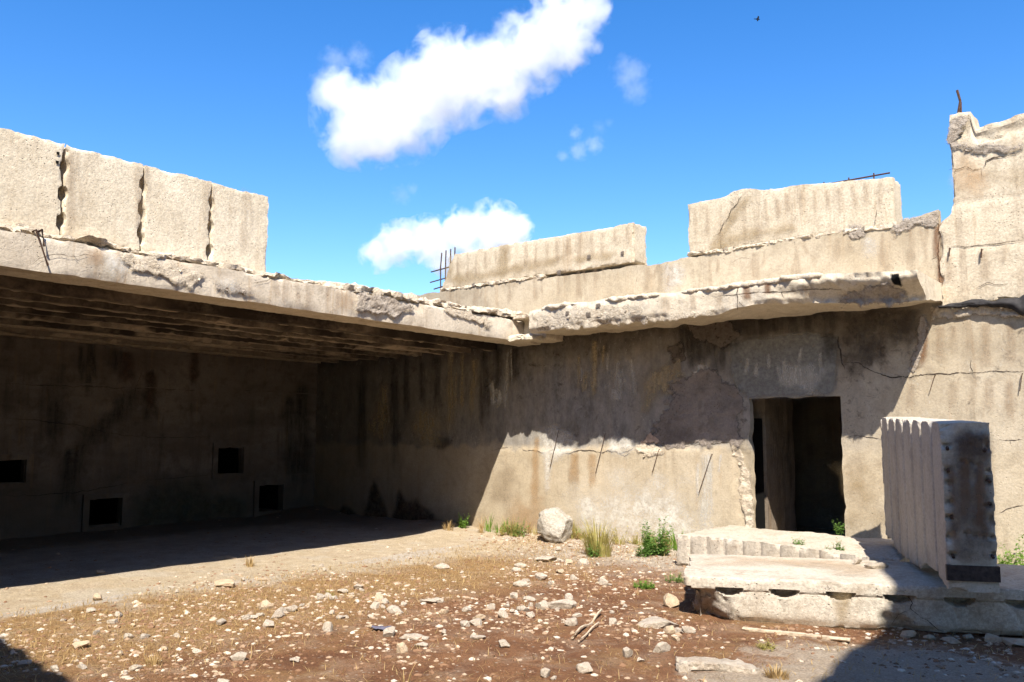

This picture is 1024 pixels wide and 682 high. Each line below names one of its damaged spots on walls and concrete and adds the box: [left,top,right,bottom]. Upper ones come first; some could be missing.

spalling [946,90,1024,154]
spalling [118,251,205,290]
spalling [356,292,415,318]
spalling [444,306,491,329]
spalling [840,274,908,308]
crack [837,337,1021,378]
flaking render [635,368,754,527]